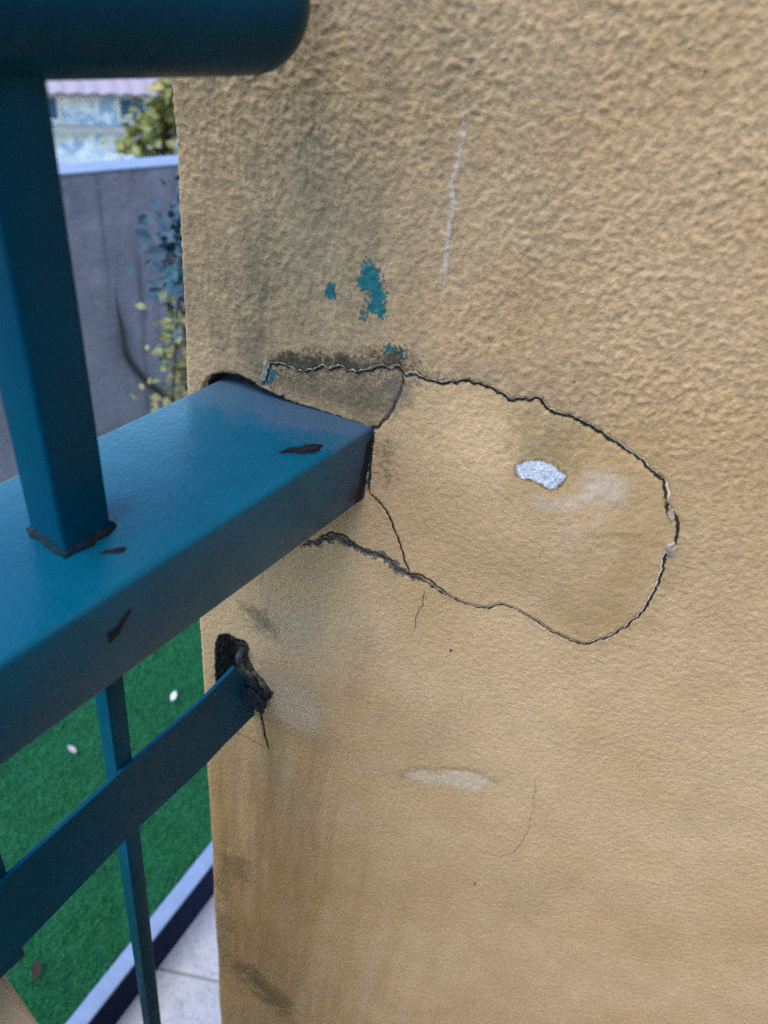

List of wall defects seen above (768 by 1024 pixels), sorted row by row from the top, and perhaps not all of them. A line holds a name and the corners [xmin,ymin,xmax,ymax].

damp [271,350,420,376]
rust [350,438,372,504]
crack [261,361,680,645]
peeling [514,461,566,490]
spalling [214,633,274,699]
peeling [406,770,488,791]